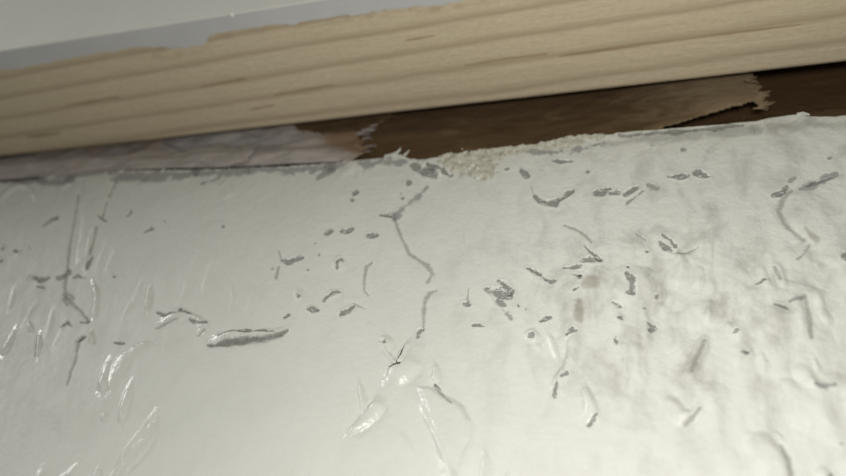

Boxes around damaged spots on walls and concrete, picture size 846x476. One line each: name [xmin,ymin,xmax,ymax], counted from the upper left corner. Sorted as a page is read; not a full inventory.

peeling [336,160,364,202]
crack [392,186,428,220]
flaking render [400,133,605,200]
peeling [533,190,575,207]
peeling [593,184,659,205]
peeling [668,169,708,180]
peeling [521,264,557,286]
peeling [563,246,603,278]
peeling [658,233,691,299]
peeling [293,286,358,324]
peeling [481,280,527,320]
peeling [606,265,656,365]